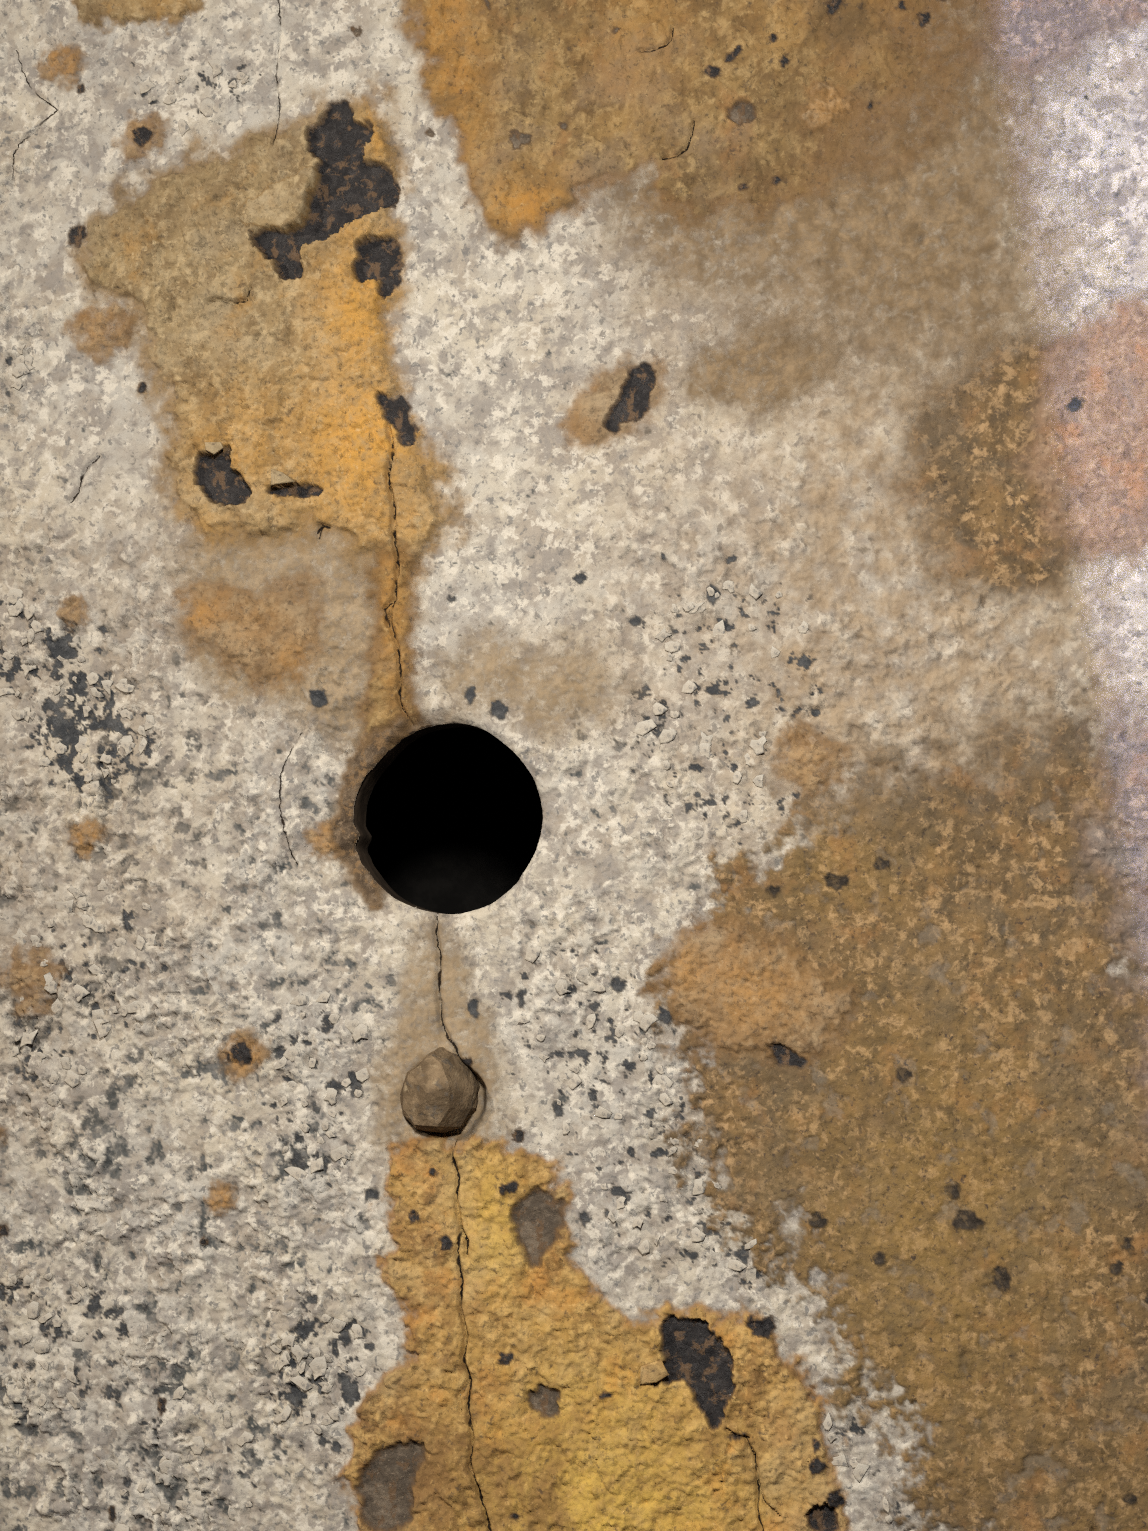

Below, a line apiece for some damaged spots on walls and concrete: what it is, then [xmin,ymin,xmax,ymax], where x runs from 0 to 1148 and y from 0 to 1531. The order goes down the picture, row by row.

spalling [241,100,401,280]
rust [402,0,950,247]
spalling [194,442,323,506]
rust [64,100,454,750]
spalling [604,362,656,434]
rust [912,302,1148,591]
crack [384,444,408,716]
crack [435,916,461,1059]
rust [338,716,1148,1531]
crack [452,1141,469,1300]
crack [461,1345,491,1531]
spalling [640,1315,746,1440]